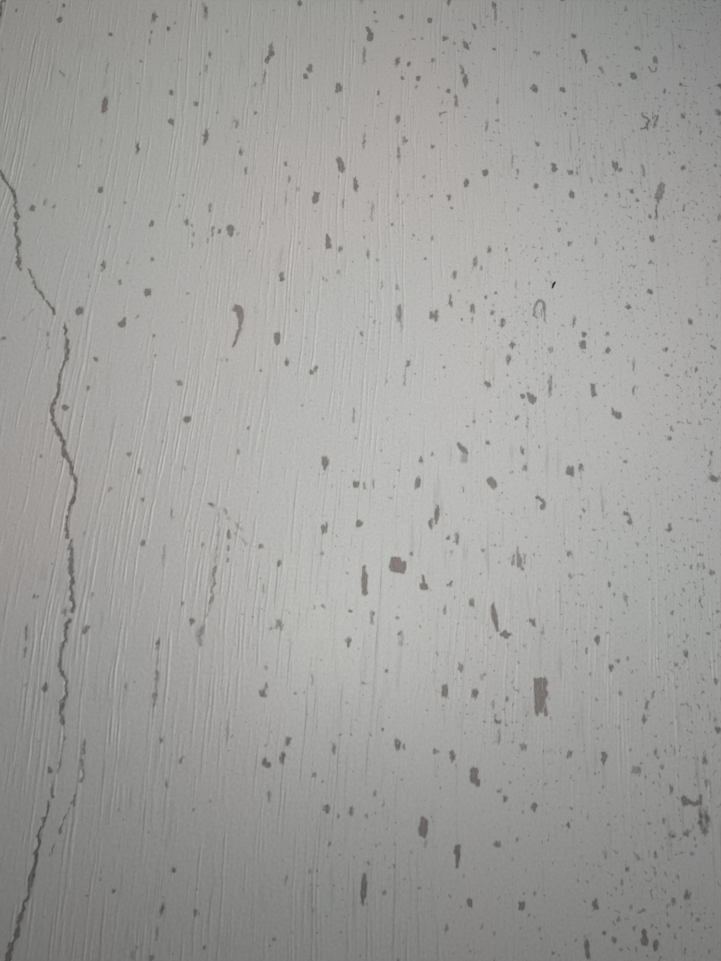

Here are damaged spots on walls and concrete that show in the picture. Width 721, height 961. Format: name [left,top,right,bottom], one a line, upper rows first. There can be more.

crack [0,170,77,725]
crack [5,788,75,961]